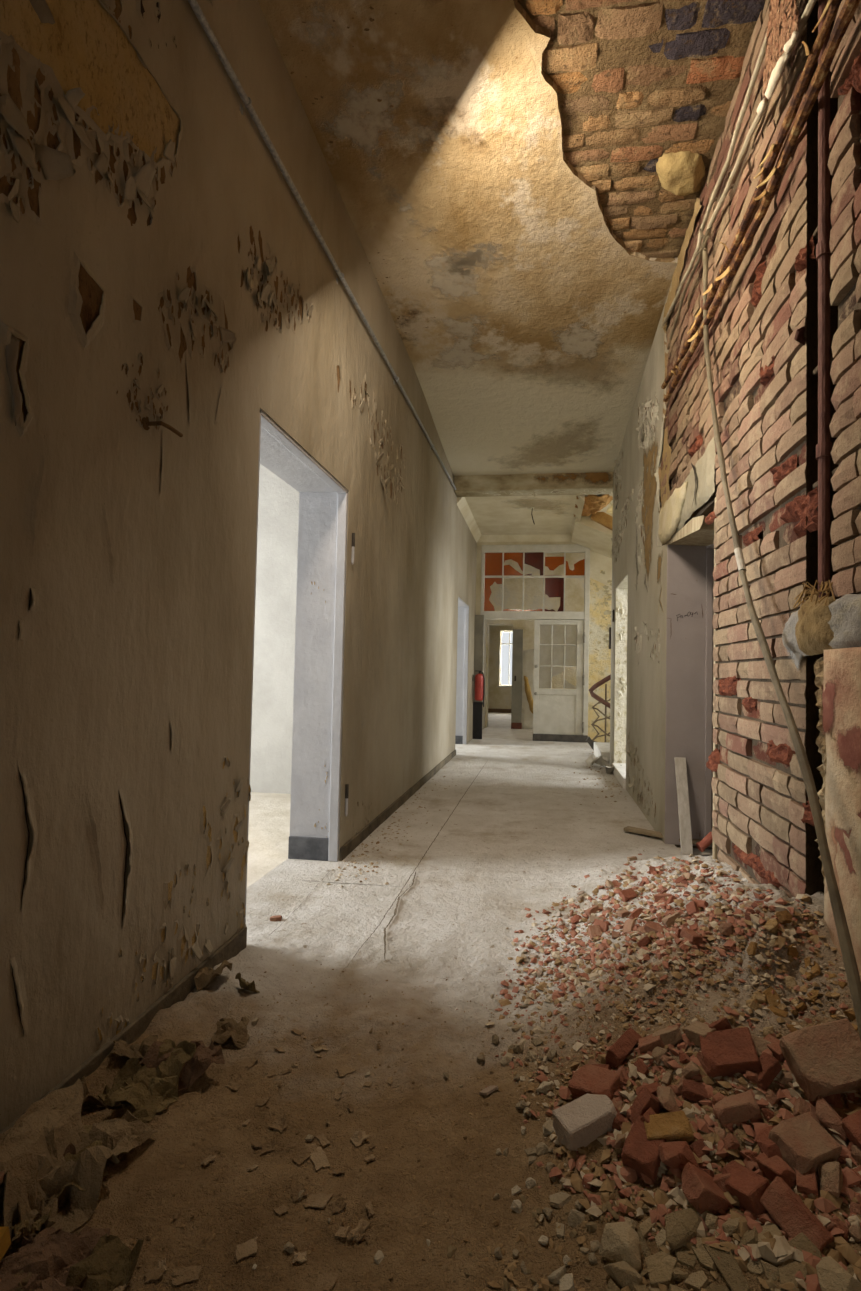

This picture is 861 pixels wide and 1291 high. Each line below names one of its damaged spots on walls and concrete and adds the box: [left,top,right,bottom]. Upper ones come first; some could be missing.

peeling [0,0,185,231]
peeling [156,260,237,375]
flaking render [485,0,861,898]